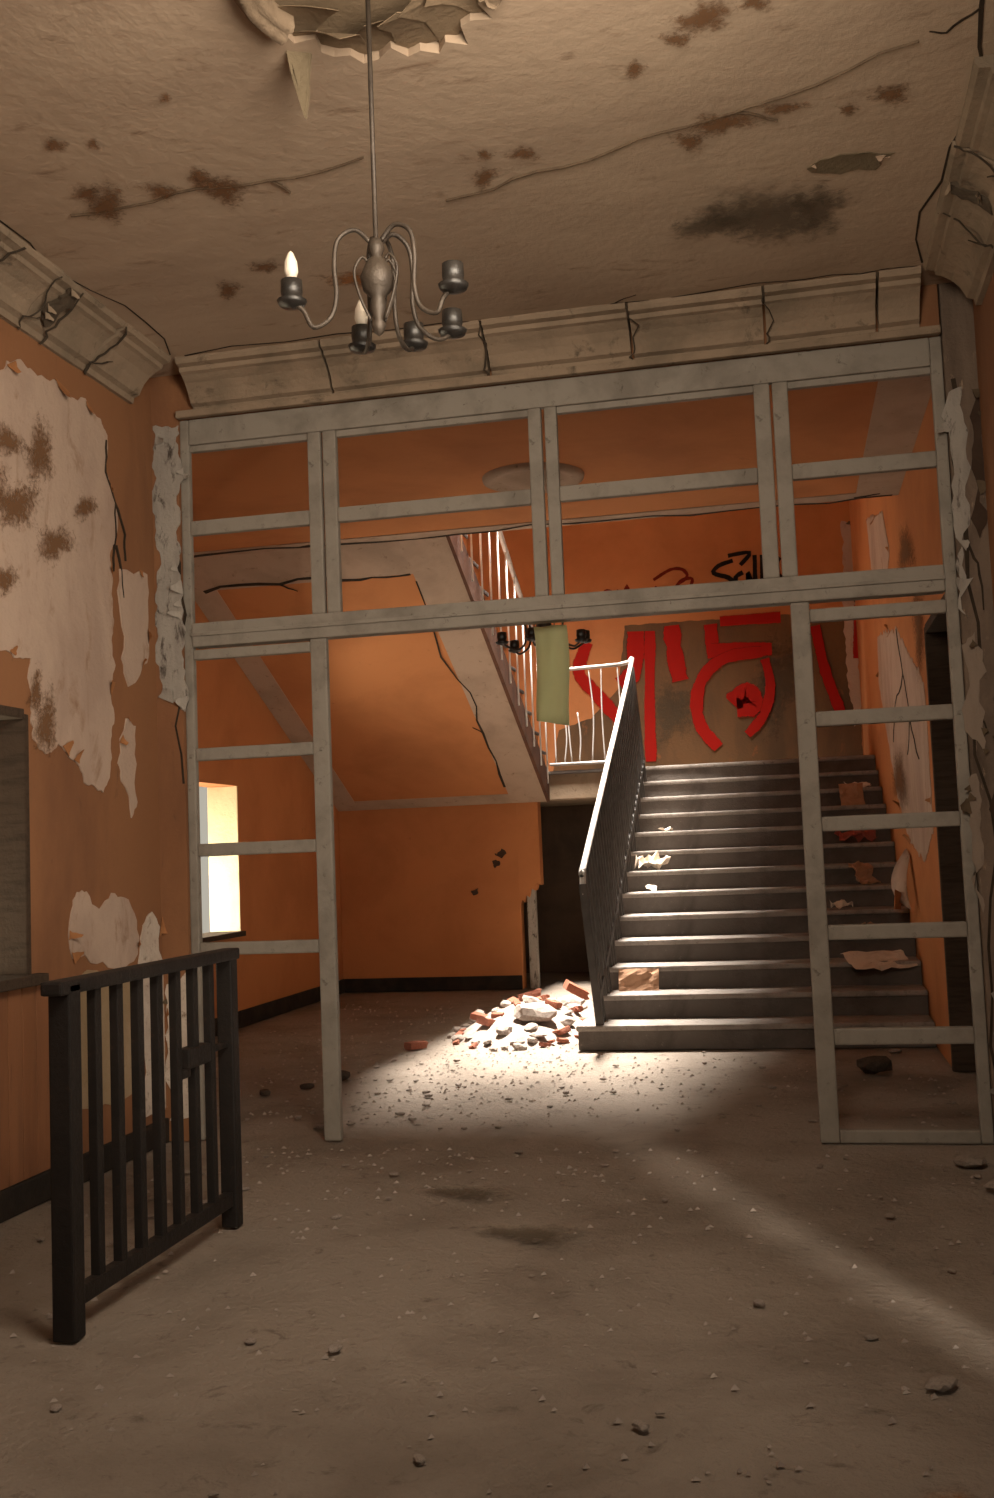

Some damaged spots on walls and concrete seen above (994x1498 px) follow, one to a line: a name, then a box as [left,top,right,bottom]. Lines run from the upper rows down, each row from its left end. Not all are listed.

crack [71,156,364,217]
crack [446,0,984,202]
leakage [685,193,842,238]
crack [612,136,994,360]
peeling [0,359,892,818]
peeling [68,890,189,1121]